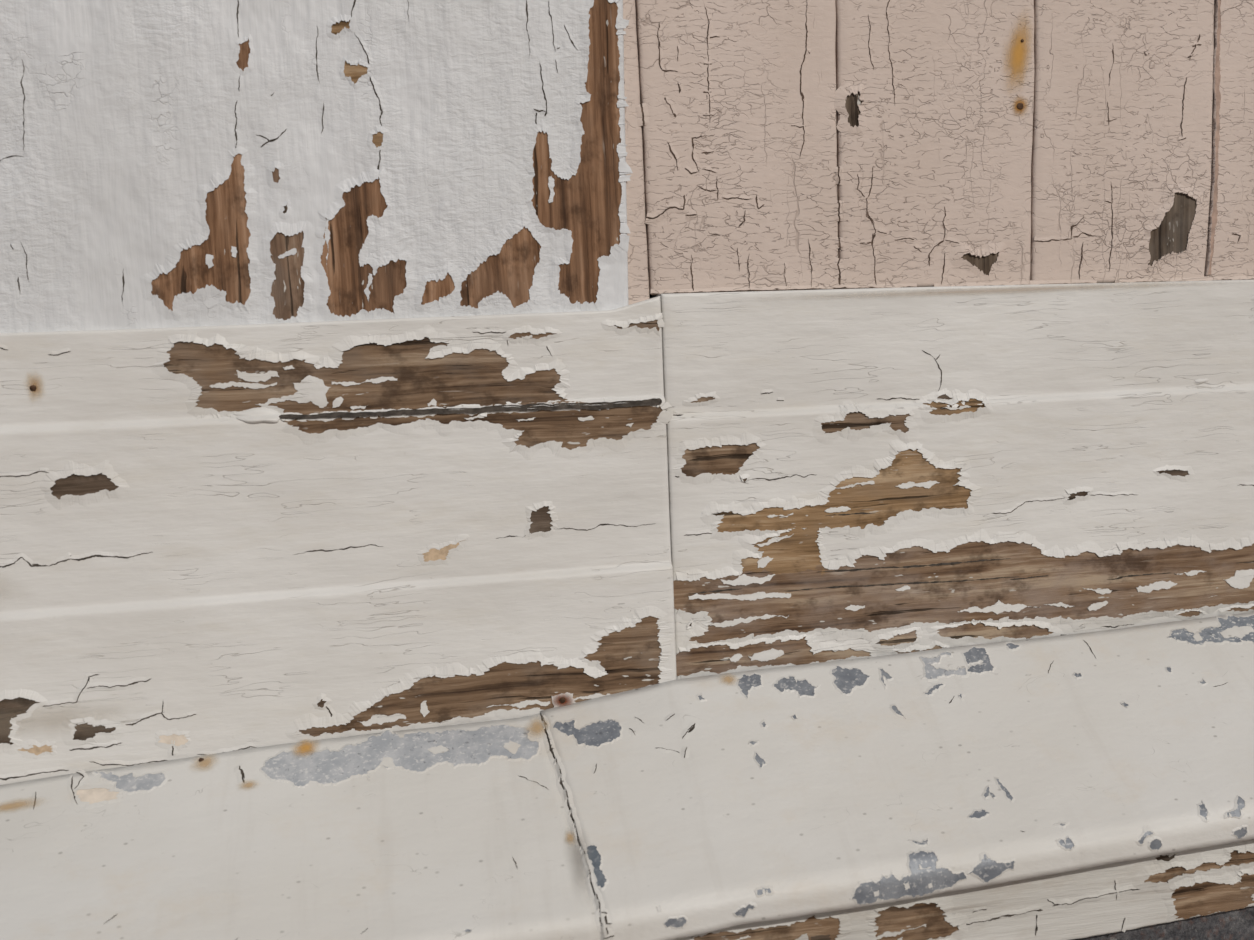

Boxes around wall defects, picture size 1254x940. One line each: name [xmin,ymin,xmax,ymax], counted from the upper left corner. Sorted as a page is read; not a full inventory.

crack [234,75,286,148]
crack [316,27,324,134]
crack [351,0,386,170]
crack [623,0,1254,295]
corrosion [1010,30,1027,77]
corrosion [1015,100,1025,112]
peeling [139,0,720,460]
peeling [1137,183,1204,275]
crack [0,549,153,568]
peeling [259,388,1254,788]
peeling [663,838,1017,940]
peeling [1132,795,1254,922]